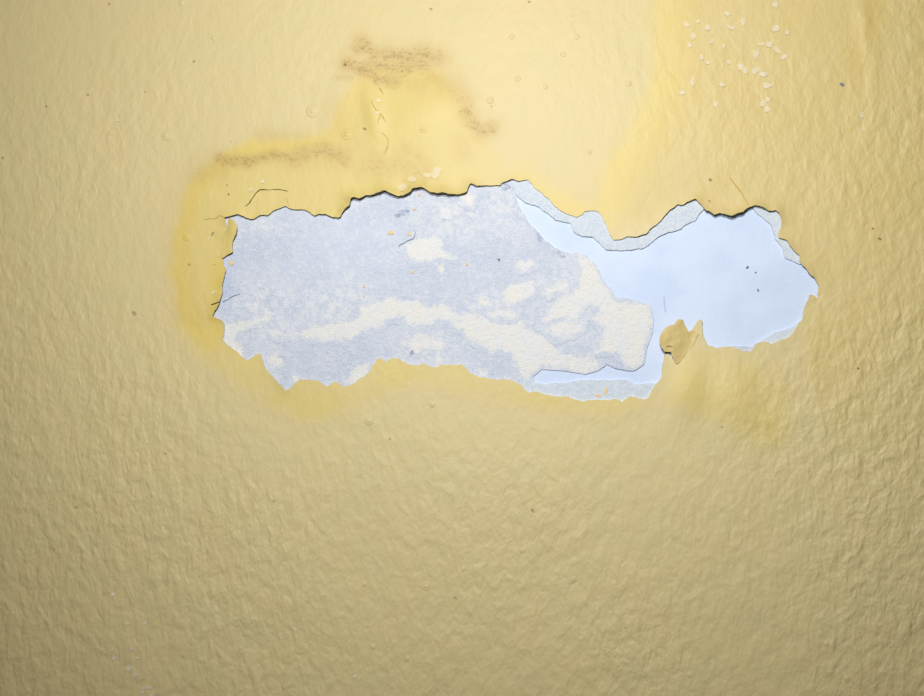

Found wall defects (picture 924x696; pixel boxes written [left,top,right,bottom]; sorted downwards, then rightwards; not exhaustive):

peeling [207,166,818,402]
water stain [158,0,924,517]